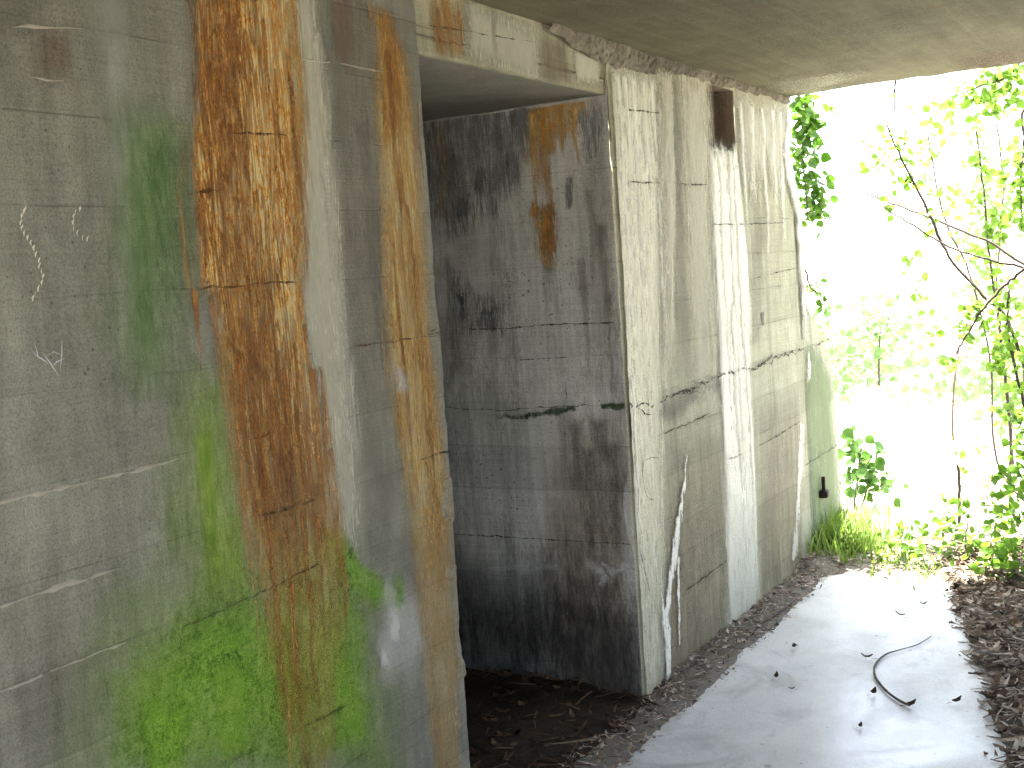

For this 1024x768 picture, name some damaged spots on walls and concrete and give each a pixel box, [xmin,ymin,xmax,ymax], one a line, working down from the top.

corrosion [185,0,347,768]
damp [287,0,373,555]
corrosion [368,6,459,768]
corrosion [523,101,585,269]
crack [450,338,832,500]
damp [456,3,831,697]
spalling [549,23,791,104]